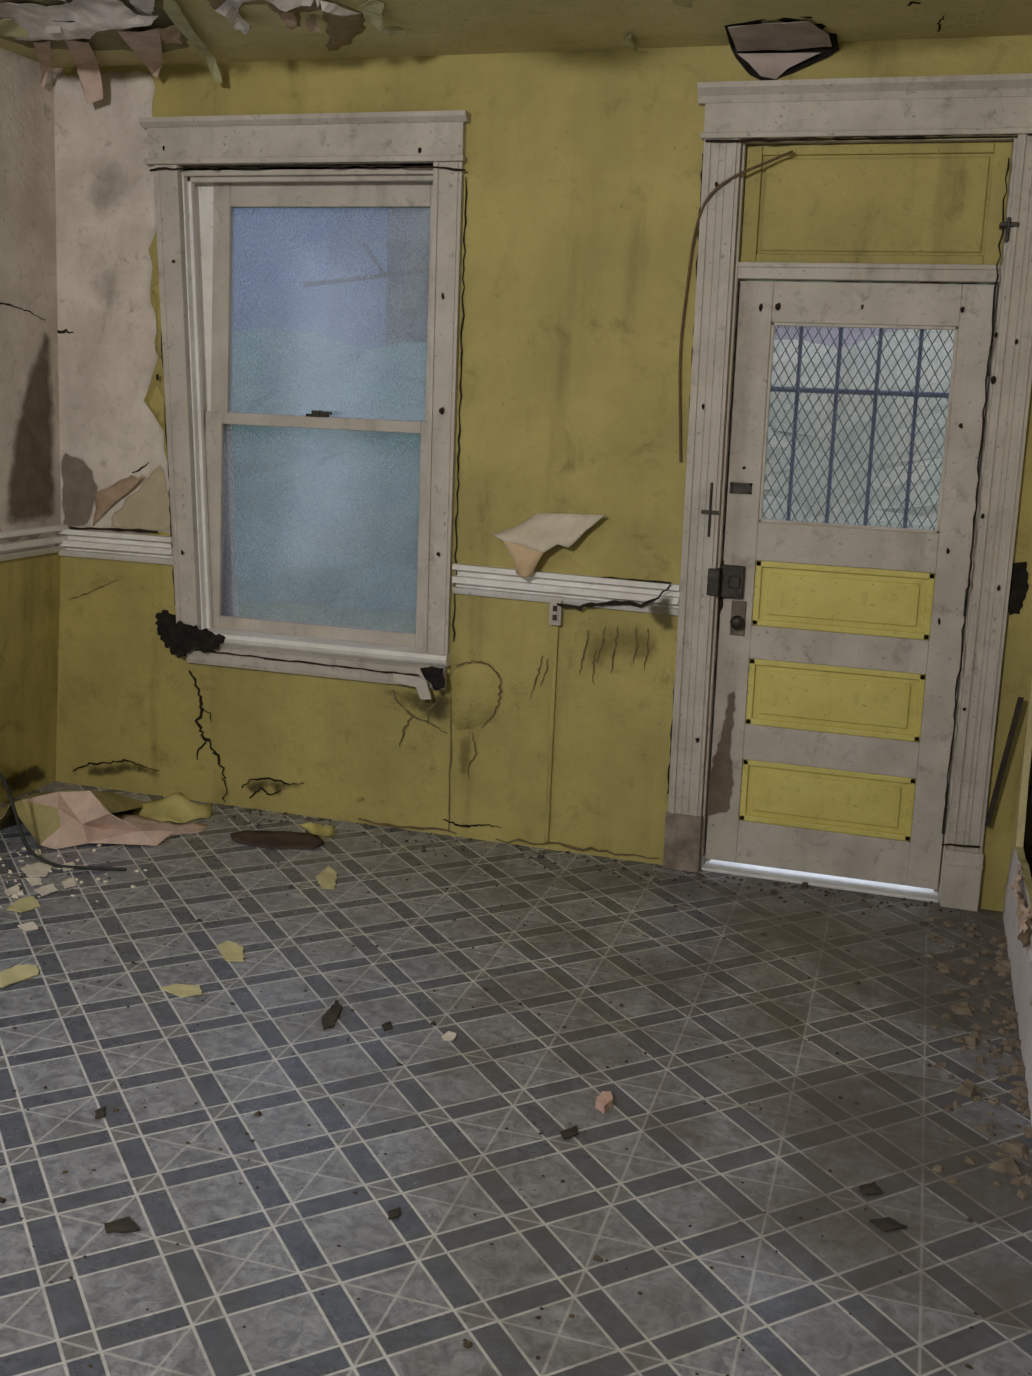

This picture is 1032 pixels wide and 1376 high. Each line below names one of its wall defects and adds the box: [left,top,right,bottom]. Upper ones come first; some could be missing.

peeling [207,0,406,52]
flaking render [724,17,839,81]
flaking render [0,0,222,542]
crack [150,164,467,642]
peeling [492,513,606,579]
crack [189,649,419,802]
flaking render [1003,847,1032,1125]